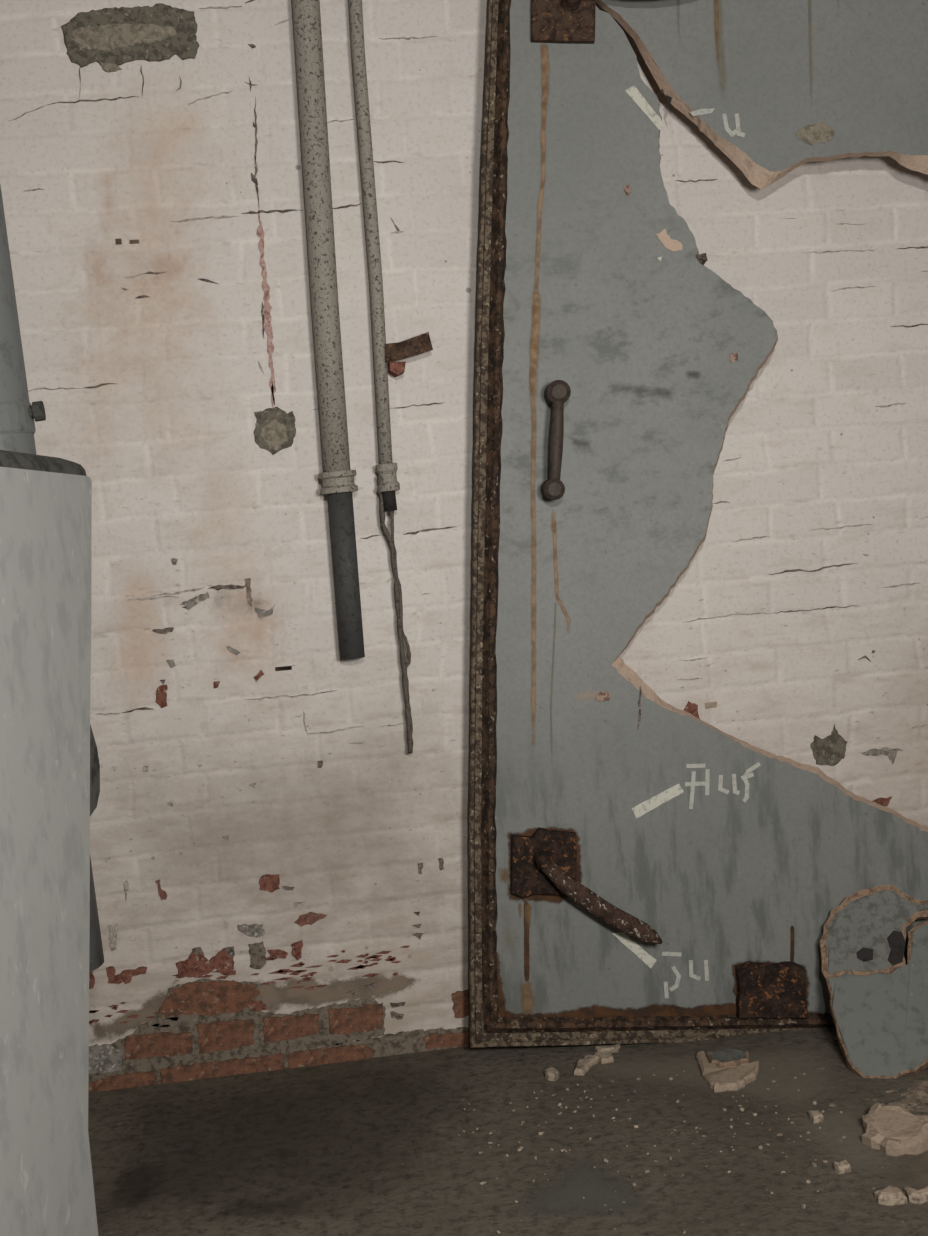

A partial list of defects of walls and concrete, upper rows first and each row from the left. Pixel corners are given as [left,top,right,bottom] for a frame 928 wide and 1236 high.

peeling [60,3,199,73]
peeling [655,229,708,265]
rust [530,45,549,725]
rust [550,512,570,710]
spalling [684,701,717,719]
spalling [810,724,847,766]
spalling [862,748,898,764]
spalling [873,797,892,806]
rust [497,827,775,1018]
peeling [88,874,470,1093]
rust [790,926,821,1014]